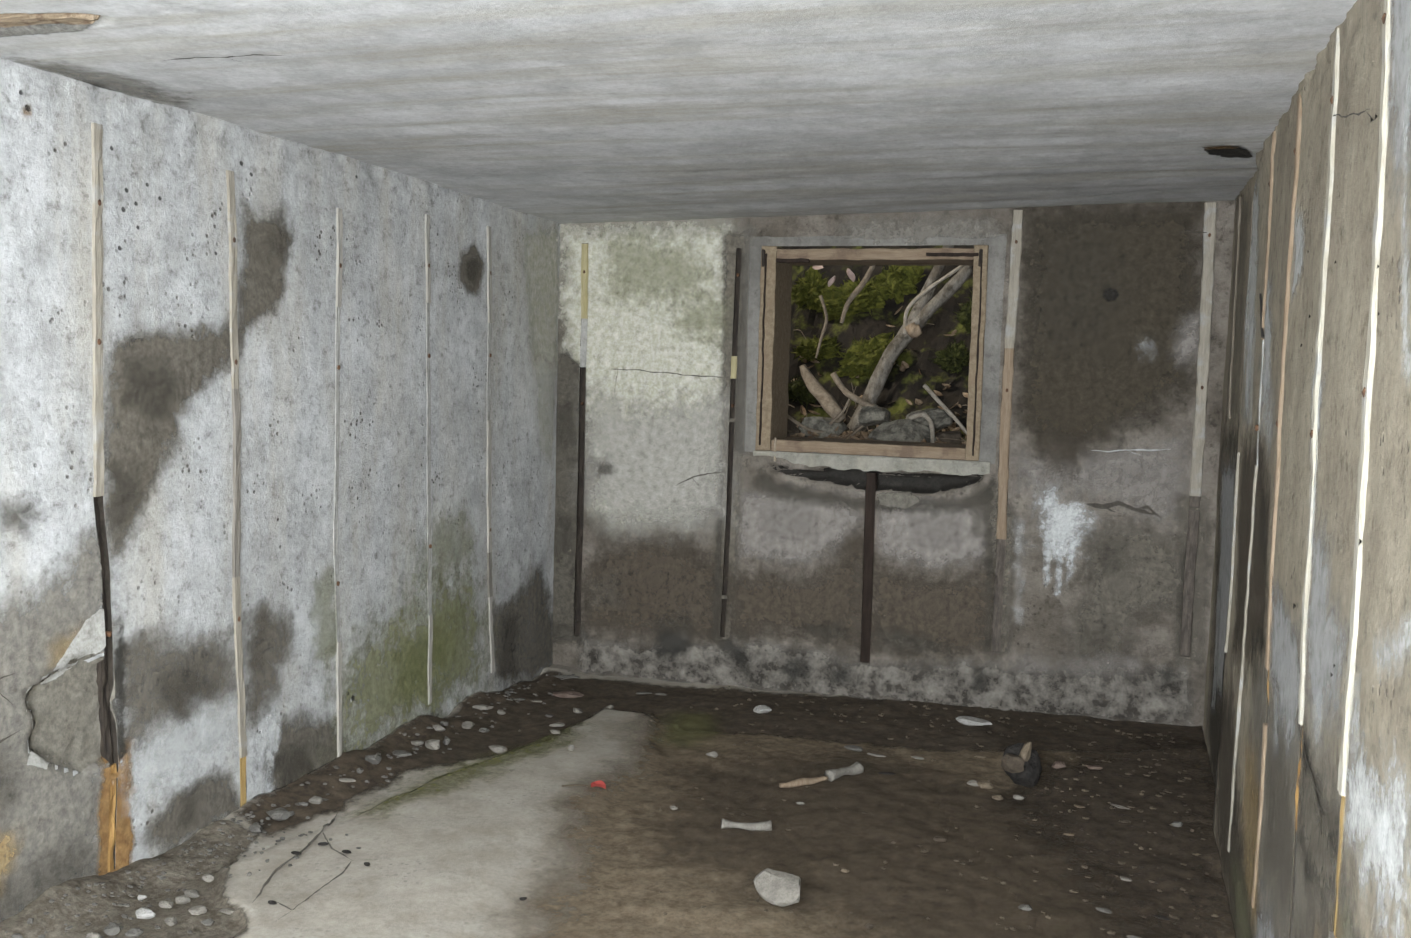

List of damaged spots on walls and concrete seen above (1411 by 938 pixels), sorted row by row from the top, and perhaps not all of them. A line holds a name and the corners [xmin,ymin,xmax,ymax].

spalling [0,13,101,37]
crack [1333,109,1377,121]
leakage [493,233,1015,684]
leakage [0,203,344,922]
leakage [1015,202,1407,938]
spalling [25,609,118,774]
rust [97,751,135,876]